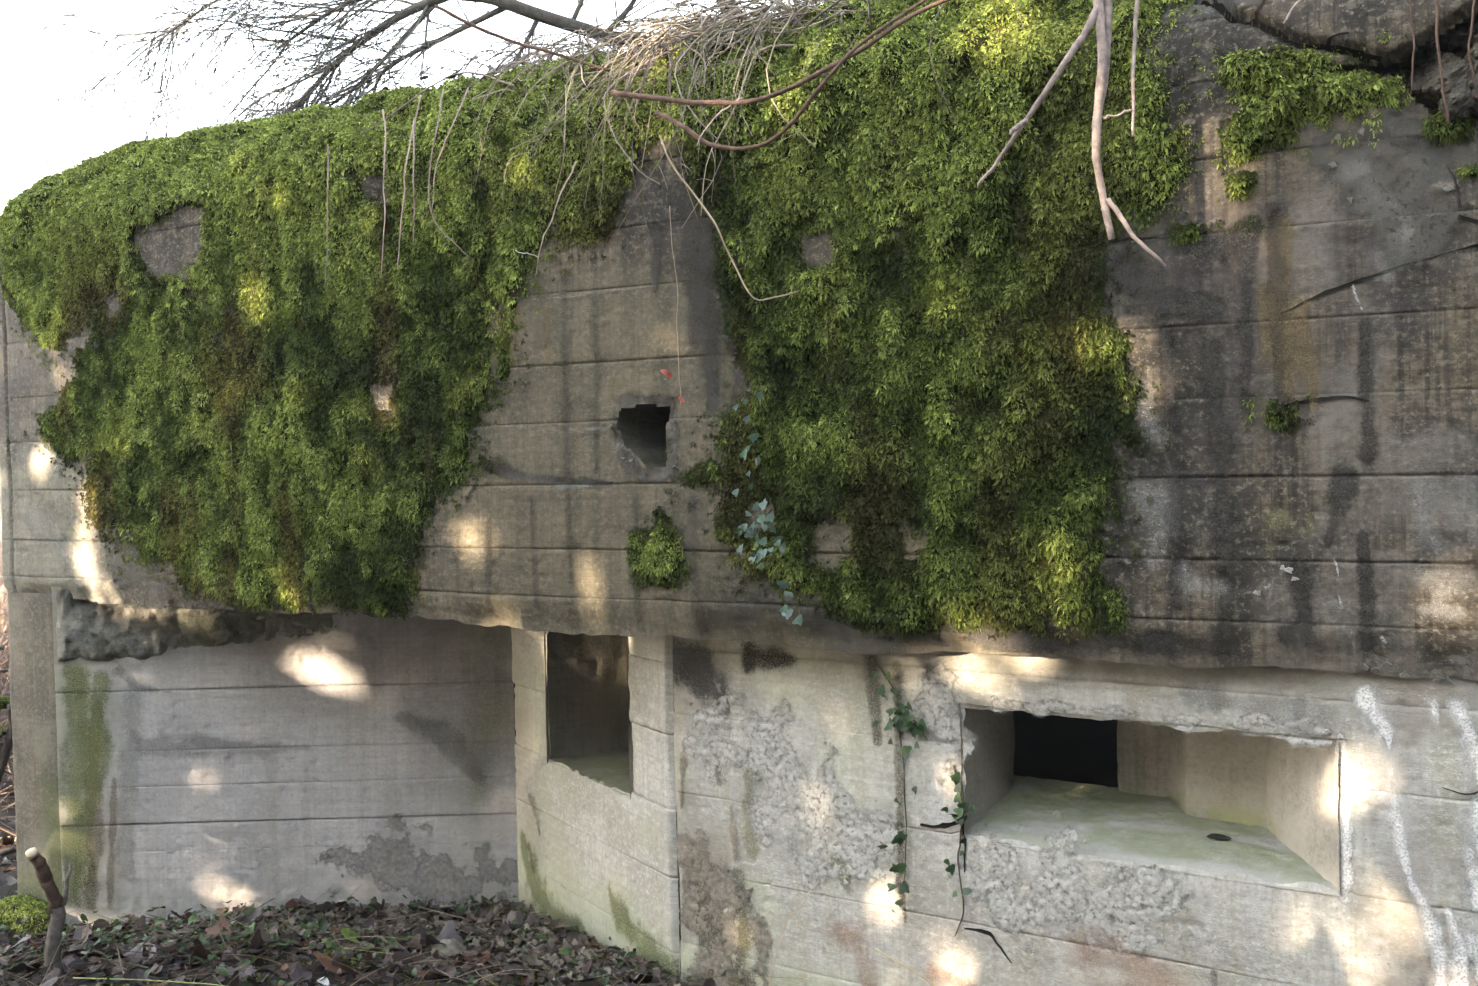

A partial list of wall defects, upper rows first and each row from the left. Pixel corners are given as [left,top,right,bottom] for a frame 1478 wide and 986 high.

crack [1280,165,1478,315]
spalling [609,394,681,483]
water stain [926,209,1287,658]
water stain [1307,284,1387,658]
spalling [50,579,372,661]
water stain [1277,560,1316,648]
water stain [84,672,112,817]
spalling [682,674,898,890]
water stain [1355,684,1478,986]
crack [1442,787,1478,795]
water stain [608,859,753,986]